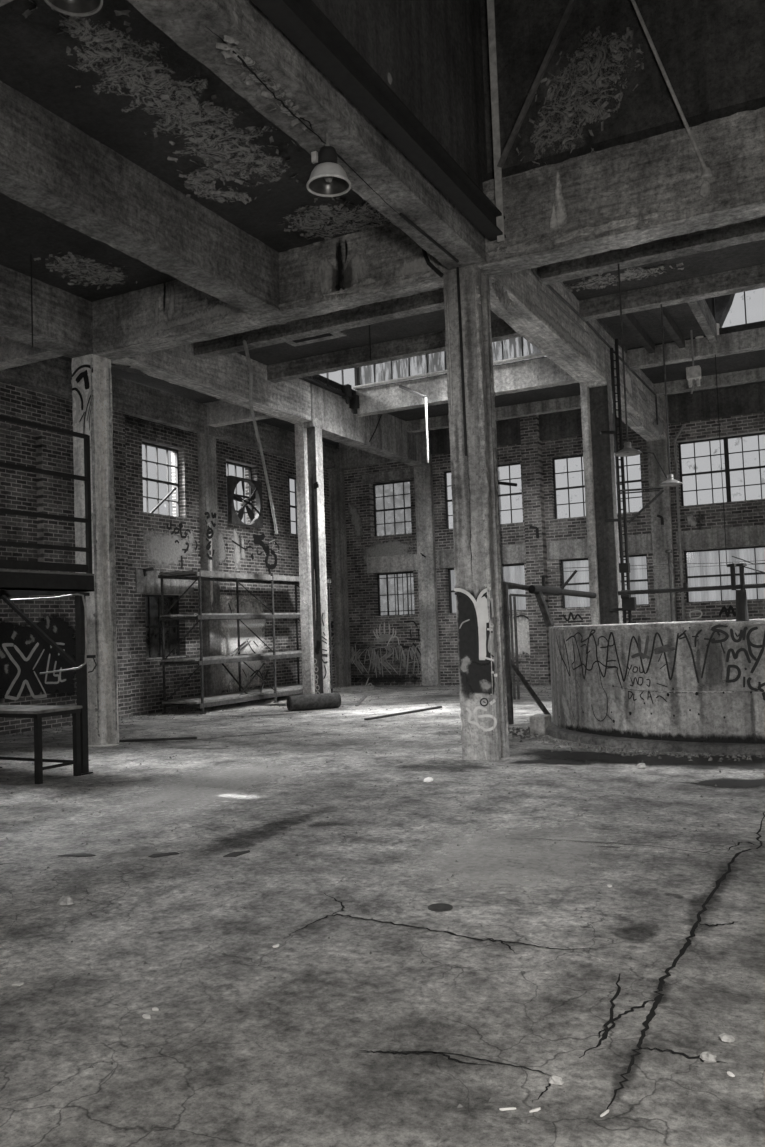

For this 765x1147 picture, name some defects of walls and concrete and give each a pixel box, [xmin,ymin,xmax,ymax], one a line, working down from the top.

peeling [22,0,307,204]
peeling [278,197,391,245]
peeling [34,252,138,290]
crack [285,893,592,953]
crack [523,812,765,1110]
crack [359,1050,551,1103]